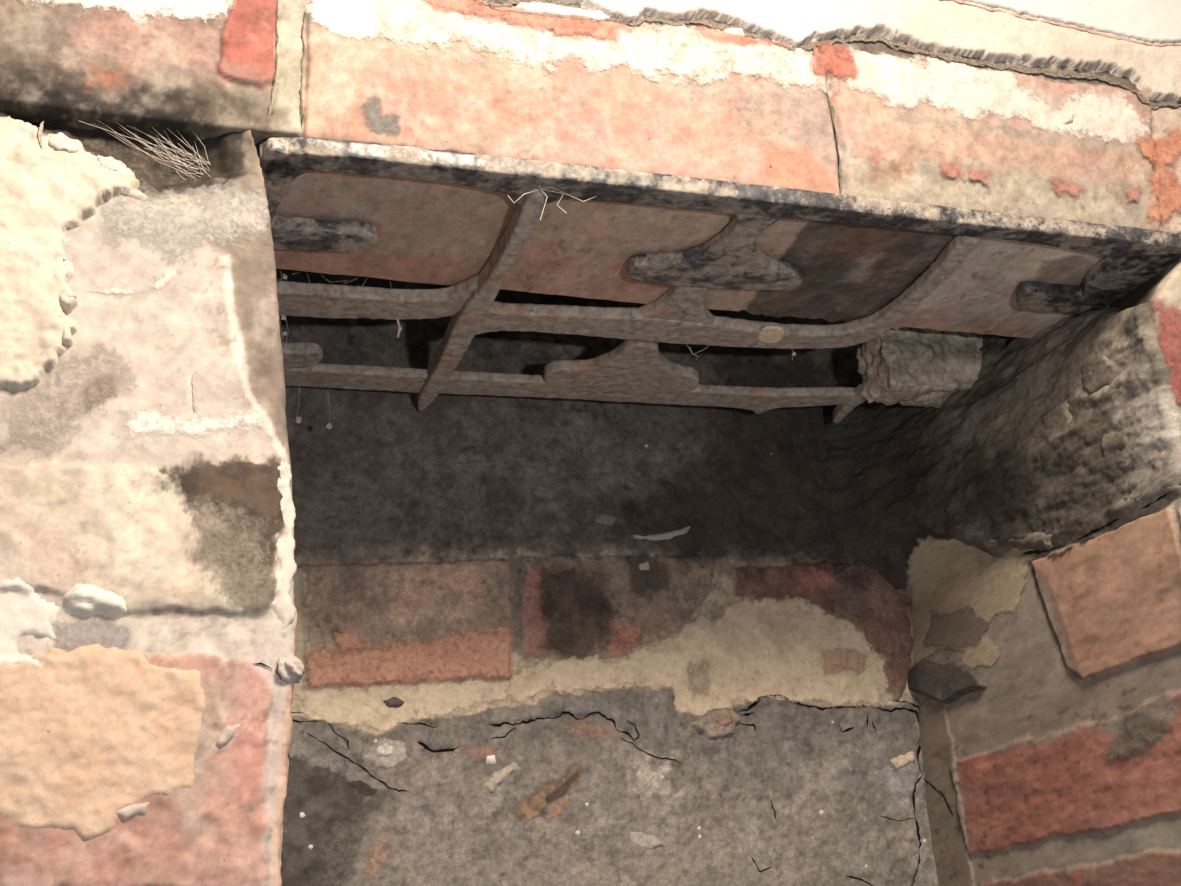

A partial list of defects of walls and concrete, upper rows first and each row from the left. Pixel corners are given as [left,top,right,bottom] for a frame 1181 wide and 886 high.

peeling [0,113,148,391]
leakage [186,495,277,614]
crack [292,712,407,792]
crack [399,722,459,752]
crack [491,711,681,763]
crack [739,694,953,885]